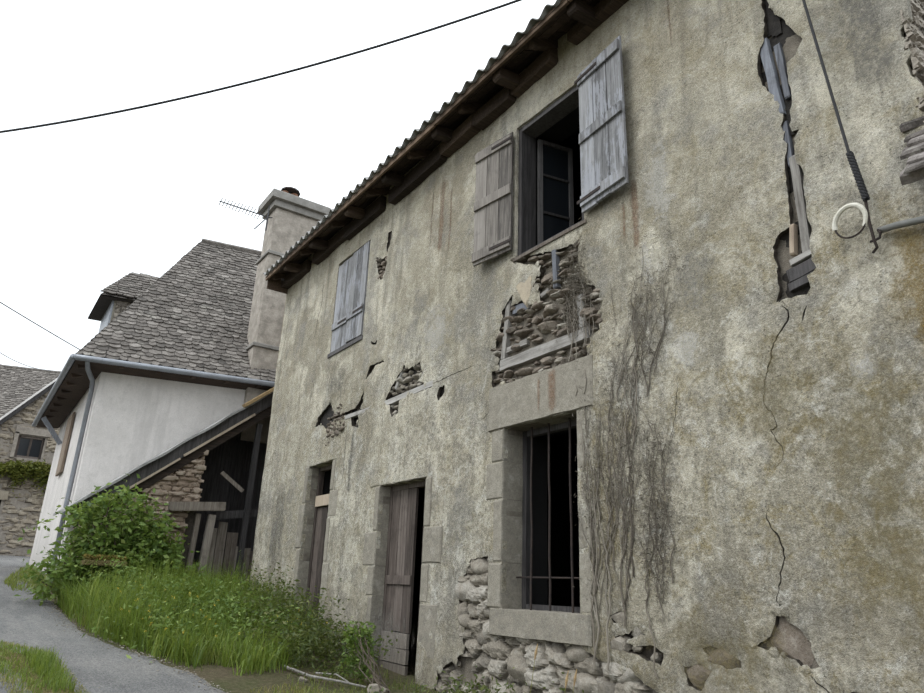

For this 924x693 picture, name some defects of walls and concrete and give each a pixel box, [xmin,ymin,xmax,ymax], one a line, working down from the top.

flaking render [780,121,816,298]
flaking render [490,239,603,386]
flaking render [319,397,369,446]
flaking render [384,360,445,416]
flaking render [433,557,664,693]